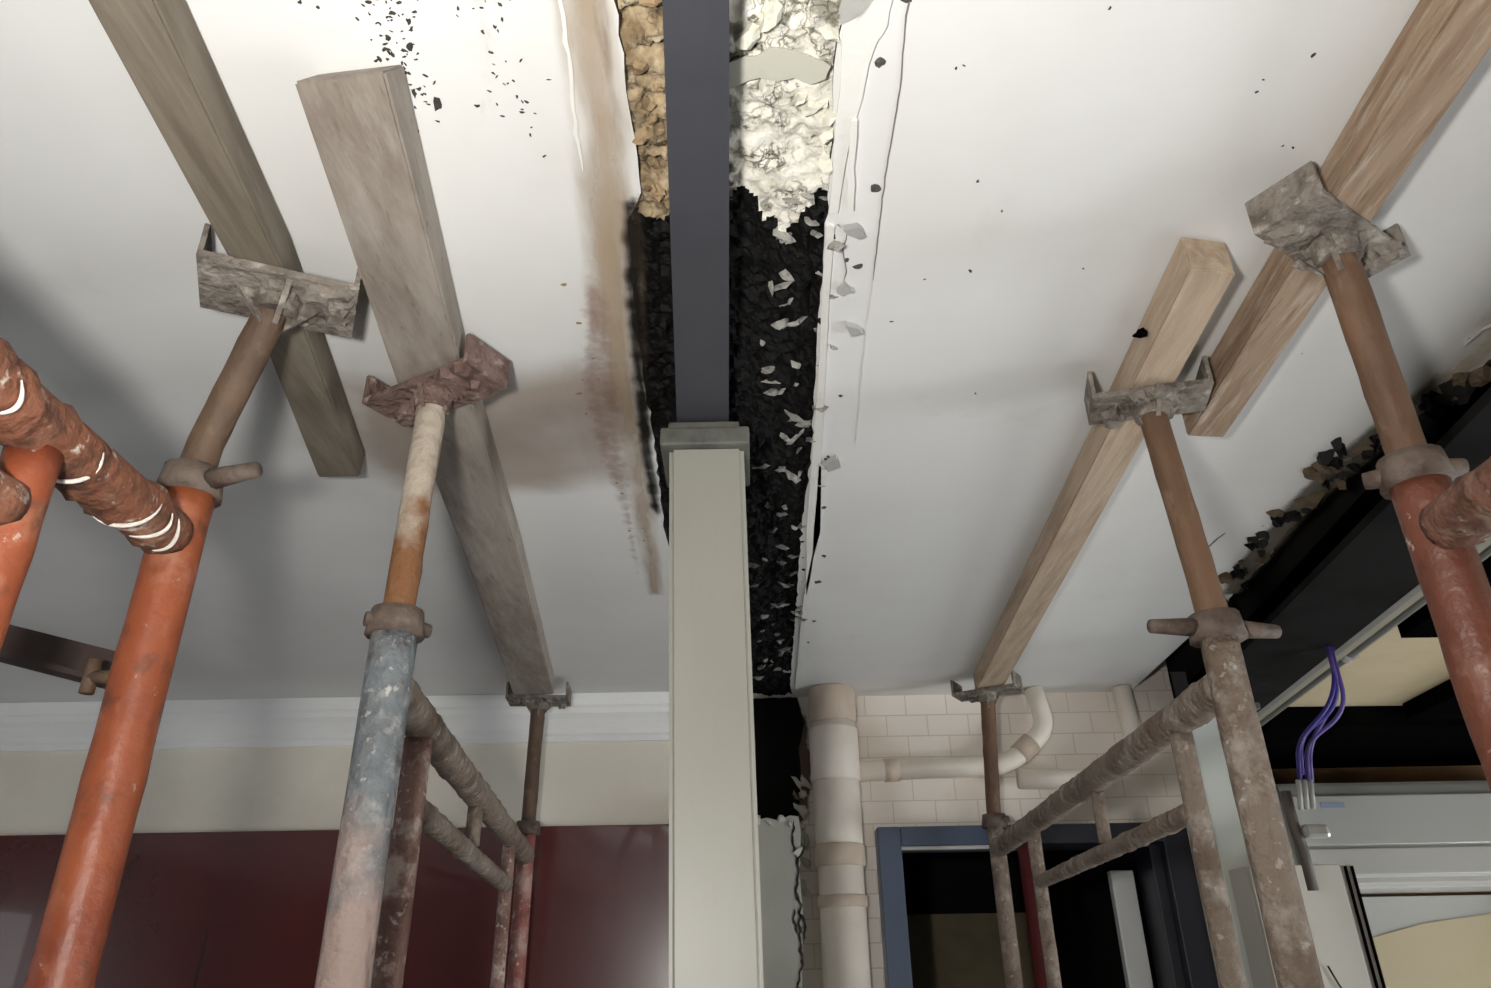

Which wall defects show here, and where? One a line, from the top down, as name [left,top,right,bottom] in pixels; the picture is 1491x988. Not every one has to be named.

damp [355,0,442,123]
damp [456,0,536,137]
spalling [729,0,912,692]
damp [1411,324,1491,417]
flaking render [1418,364,1491,437]
flaking render [1218,434,1383,608]
damp [1224,426,1381,594]